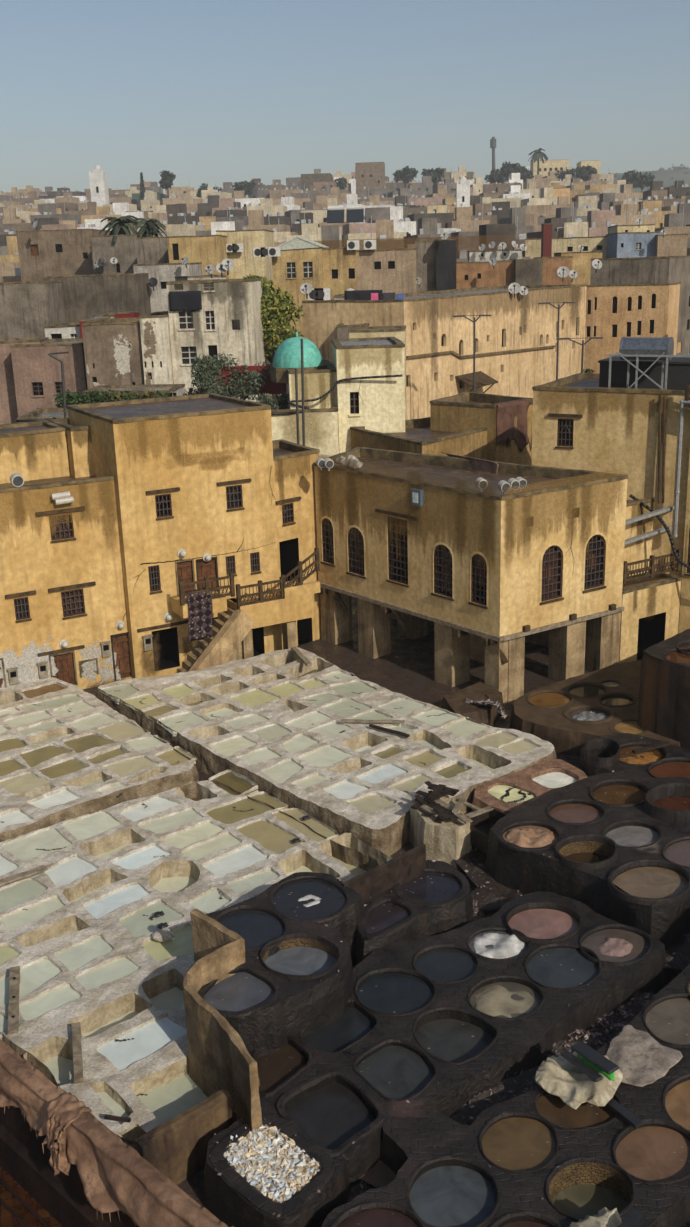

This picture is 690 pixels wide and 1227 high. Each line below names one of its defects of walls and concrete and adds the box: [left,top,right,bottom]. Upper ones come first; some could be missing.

spalling [86,321,158,386]
water stain [124,408,265,469]
spalling [0,637,541,1149]